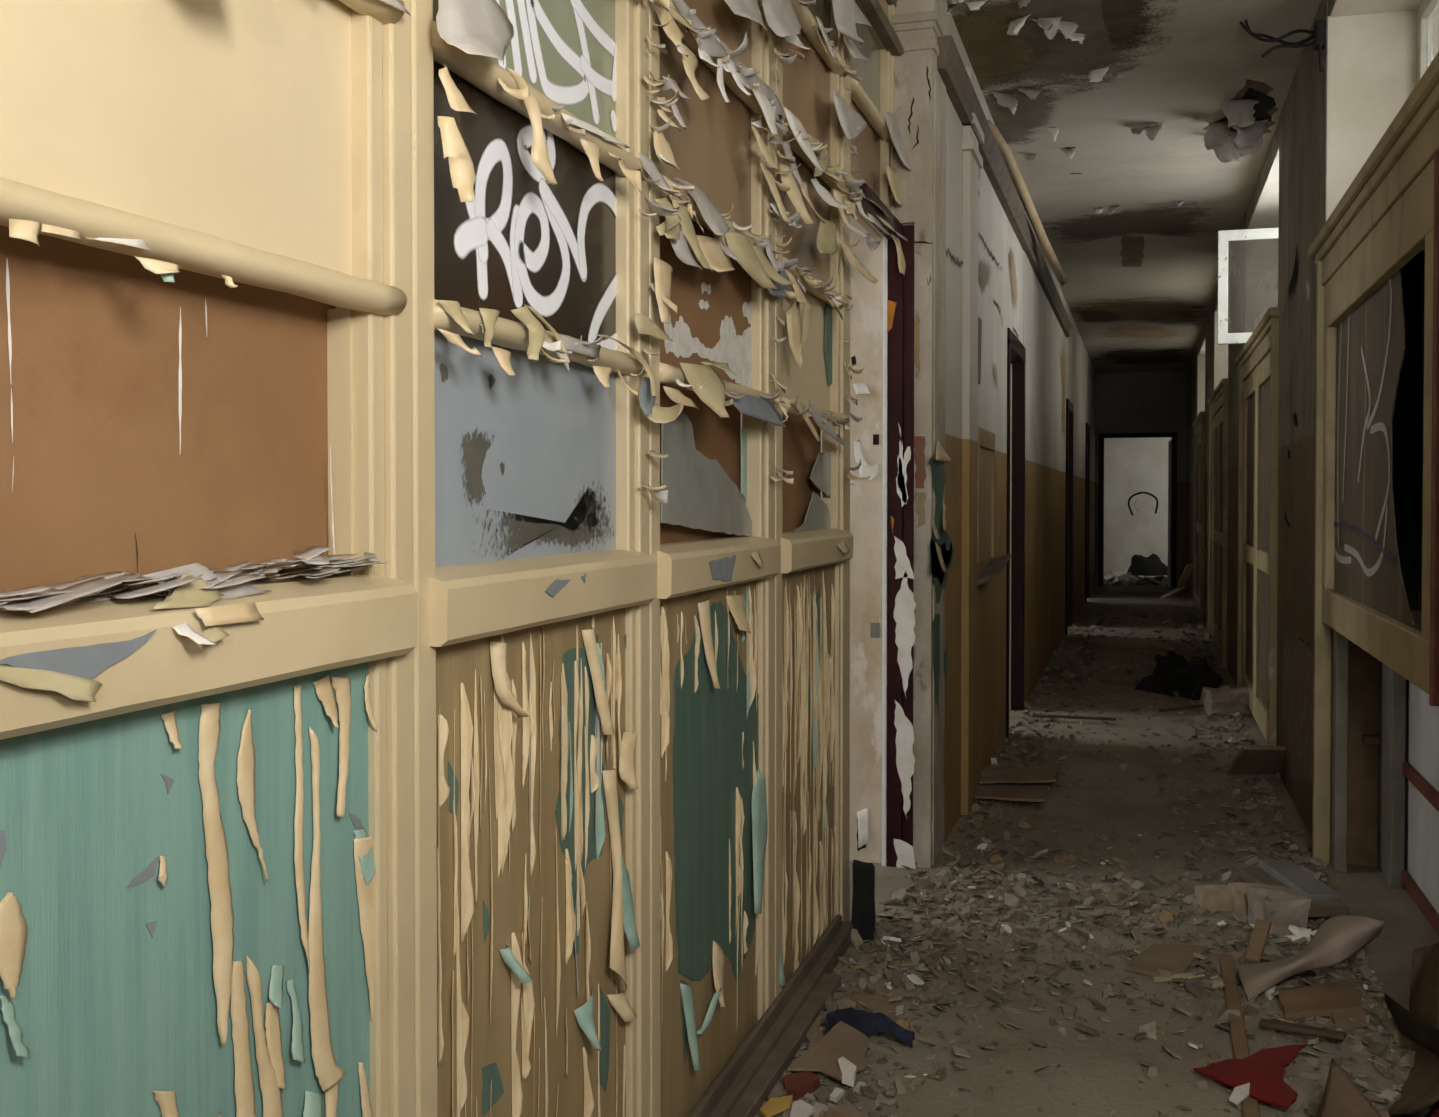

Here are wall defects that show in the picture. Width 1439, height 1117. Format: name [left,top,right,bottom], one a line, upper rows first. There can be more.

peeling [1007,0,1087,44]
leakage [949,0,1178,146]
peeling [9,219,182,283]
peeling [436,0,912,485]
peeling [0,630,156,702]
peeling [173,602,264,646]
spalling [891,423,954,817]
peeling [0,892,31,1058]
peeling [161,674,378,1117]
peeling [437,614,640,1117]
peeling [660,551,838,1071]
spalling [894,839,916,869]